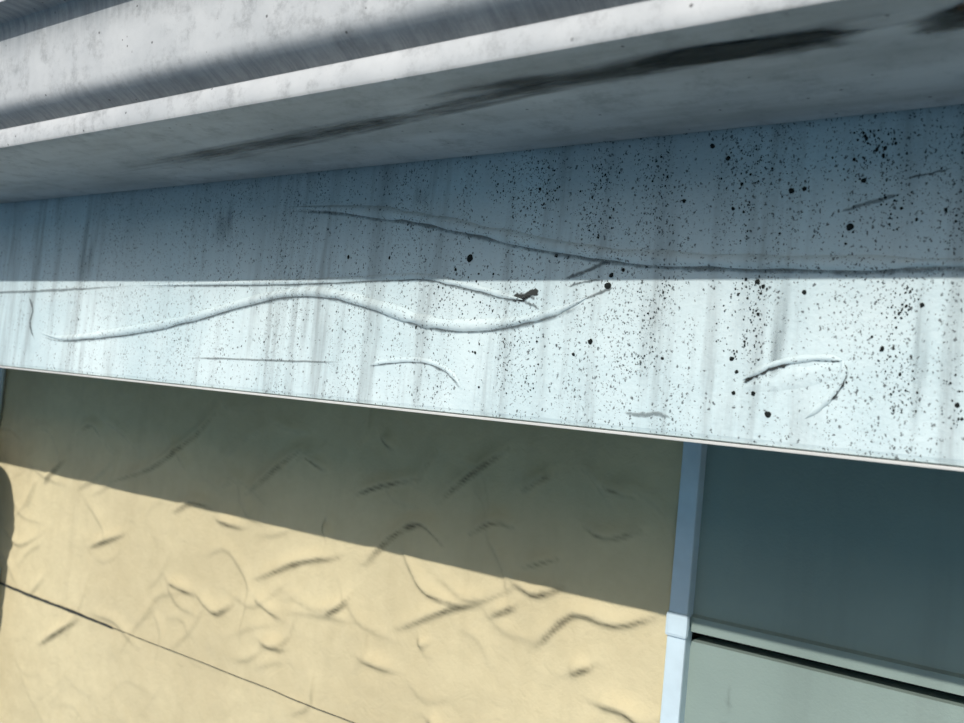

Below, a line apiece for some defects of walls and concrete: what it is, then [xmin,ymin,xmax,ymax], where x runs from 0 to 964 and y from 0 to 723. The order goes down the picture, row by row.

damp [491,160,563,230]
damp [579,154,624,239]
damp [643,149,686,234]
damp [717,140,807,246]
damp [831,128,918,232]
crack [370,357,462,389]
crack [30,205,964,341]
damp [617,266,675,372]
damp [714,275,773,396]
damp [860,277,925,413]
crack [0,582,354,723]